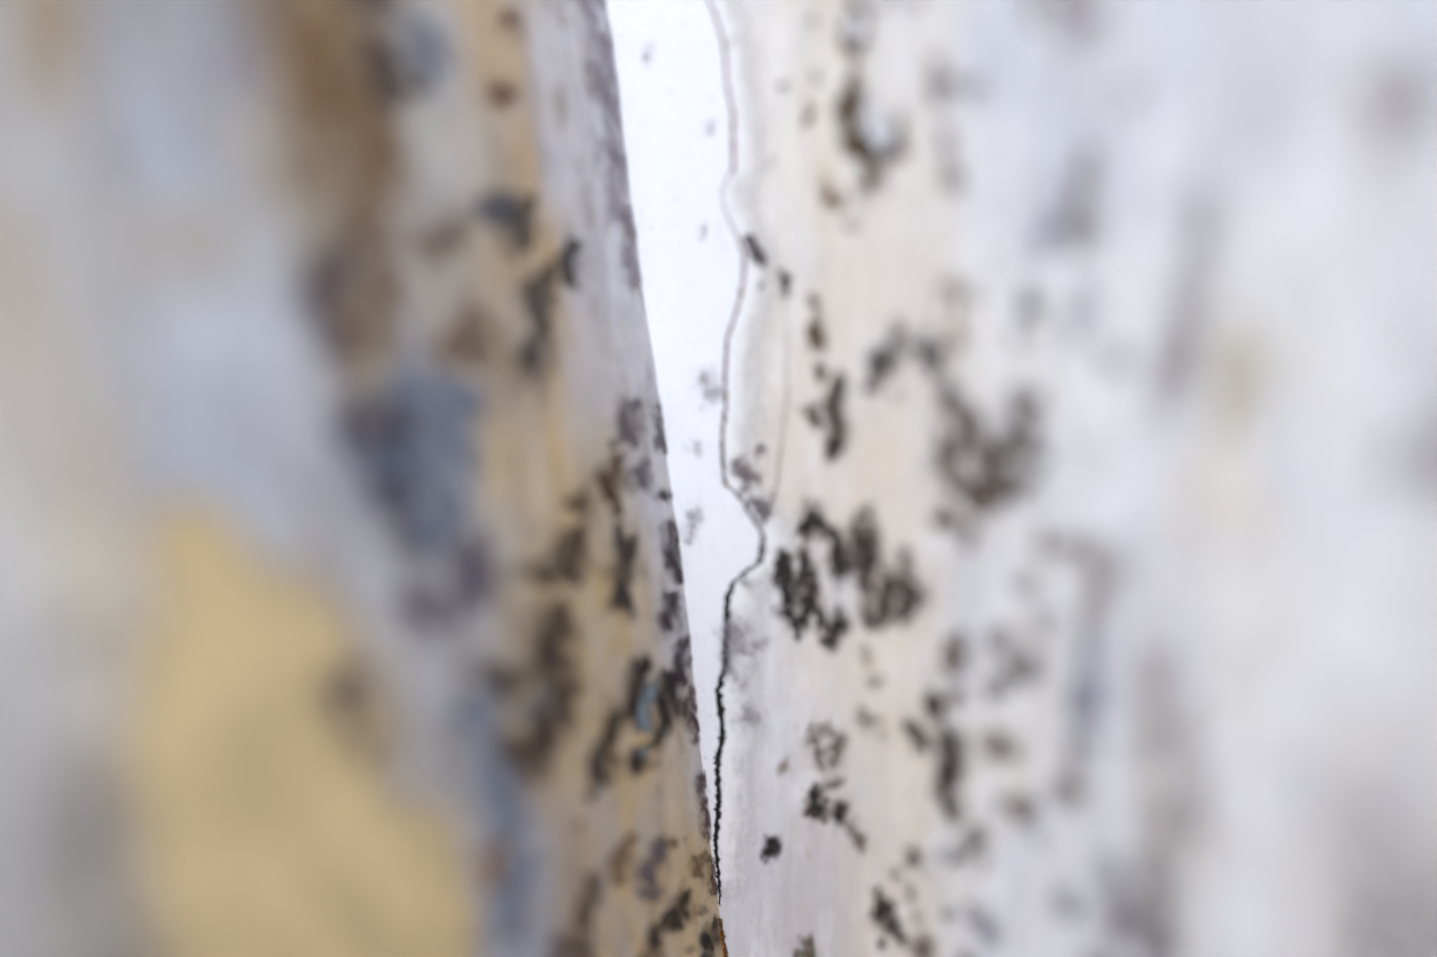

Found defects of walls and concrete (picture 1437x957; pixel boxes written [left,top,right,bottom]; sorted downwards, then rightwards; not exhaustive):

water stain [836,0,906,206]
water stain [742,231,792,295]
water stain [459,398,668,945]
water stain [586,505,702,800]
water stain [729,443,771,525]
crack [708,0,798,957]
water stain [773,498,935,649]
water stain [800,279,1049,553]
water stain [552,771,719,957]
water stain [761,836,781,860]
water stain [793,936,815,957]
water stain [801,615,1044,957]